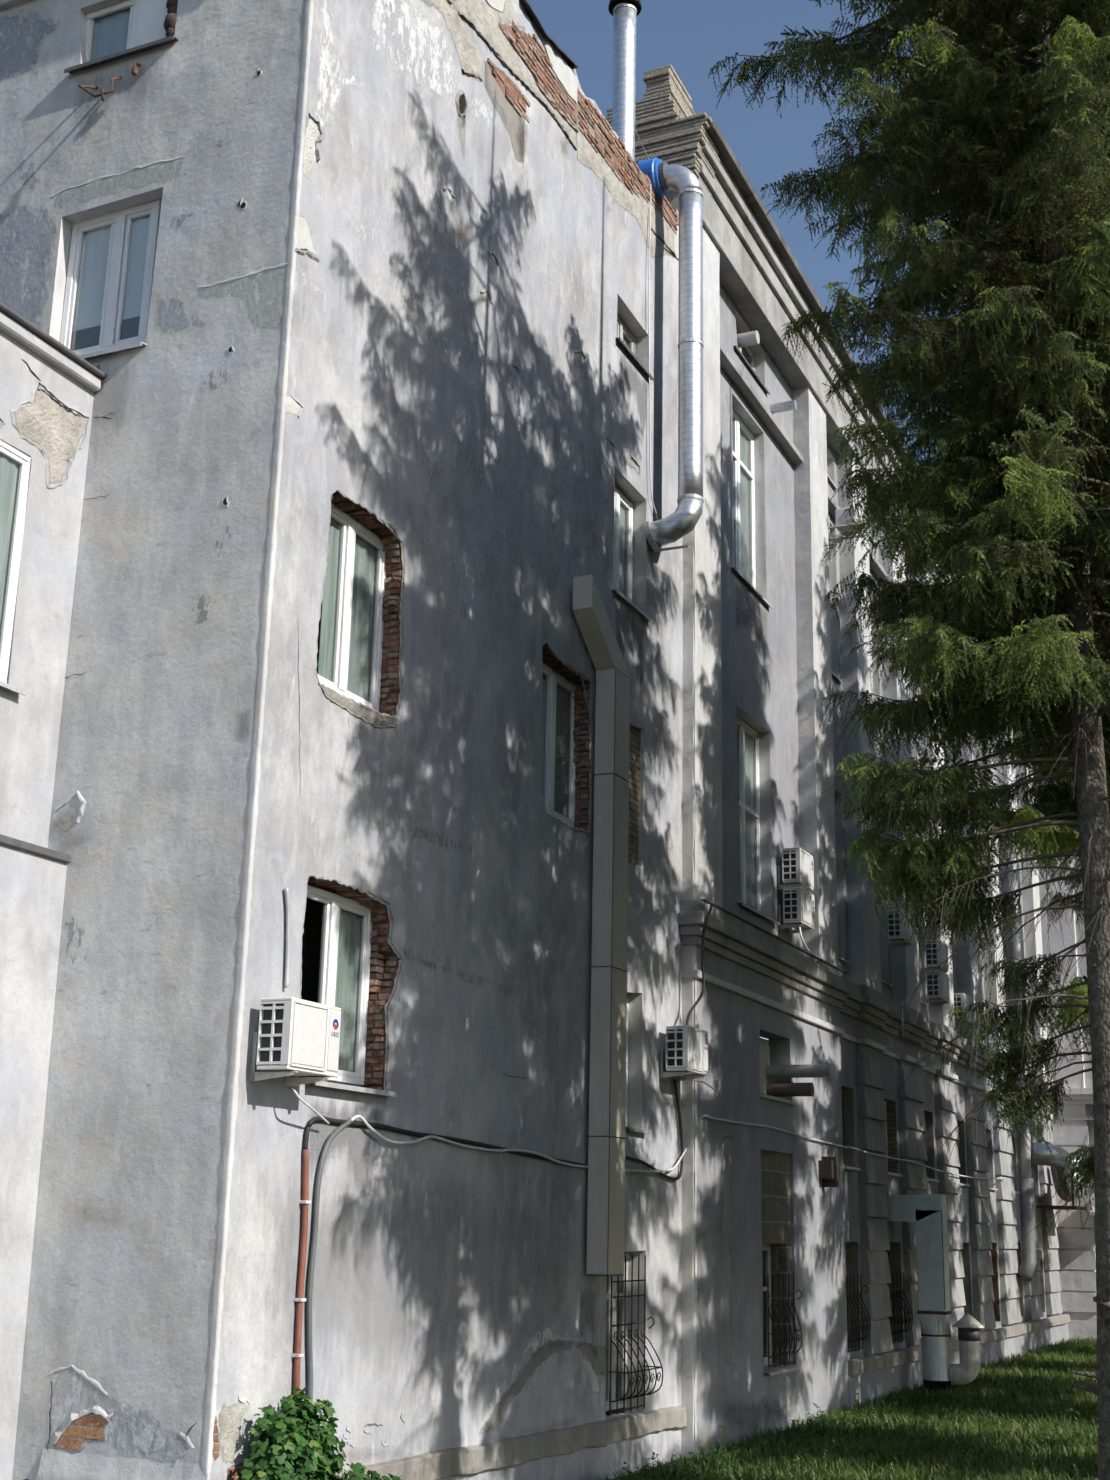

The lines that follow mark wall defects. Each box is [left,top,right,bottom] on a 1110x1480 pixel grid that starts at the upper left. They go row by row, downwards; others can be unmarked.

flaking render [370,0,679,258]
peeling [0,156,185,322]
peeling [158,216,339,332]
flaking render [0,359,90,490]
spalling [315,489,405,722]
spalling [539,640,592,835]
spalling [299,874,409,1094]
crack [24,1381,208,1480]
peeling [48,1365,250,1480]